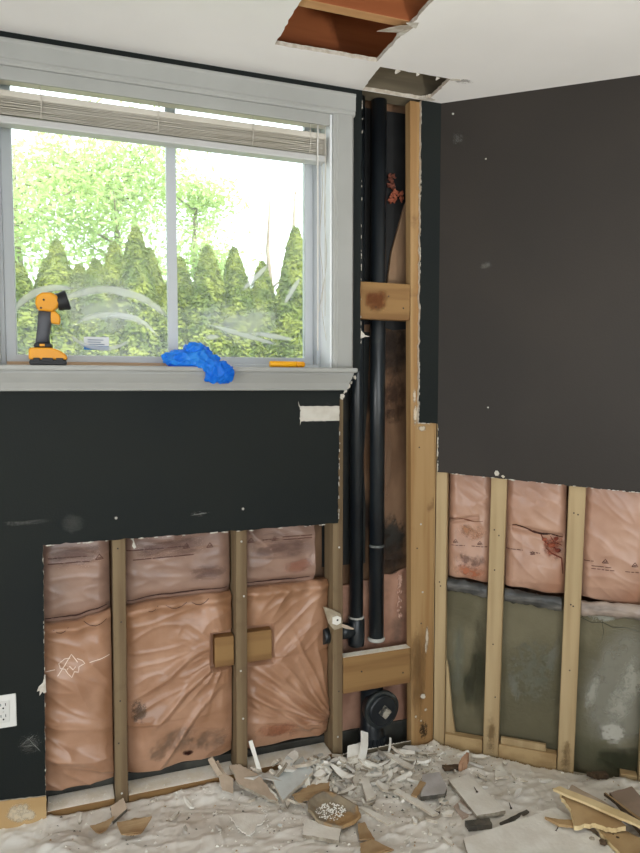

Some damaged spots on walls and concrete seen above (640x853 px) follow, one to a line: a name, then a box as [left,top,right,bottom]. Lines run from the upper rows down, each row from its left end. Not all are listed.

leakage [385,329,406,373]
leakage [465,651,483,698]
leakage [585,635,640,770]